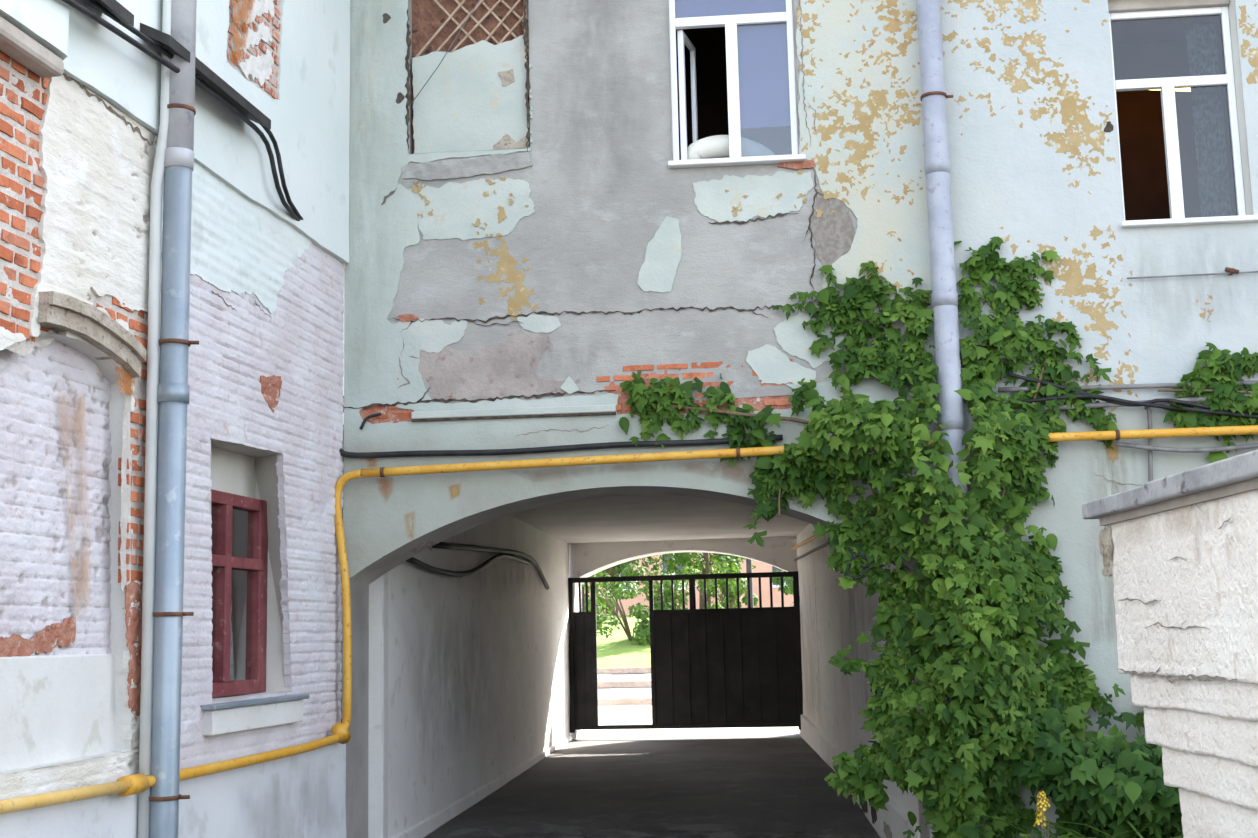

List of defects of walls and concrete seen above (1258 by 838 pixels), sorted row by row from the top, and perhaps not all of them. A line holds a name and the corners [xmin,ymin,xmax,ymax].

flaking render [226,0,281,100]
peeling [941,0,1117,194]
peeling [1238,4,1258,84]
flaking render [0,51,58,357]
crack [343,0,839,409]
flaking render [388,0,923,415]
peeling [1000,225,1138,398]
flaking render [359,406,415,424]
crack [518,425,608,436]
flaking render [0,616,76,657]
crack [1119,598,1210,630]
crack [1120,667,1237,684]